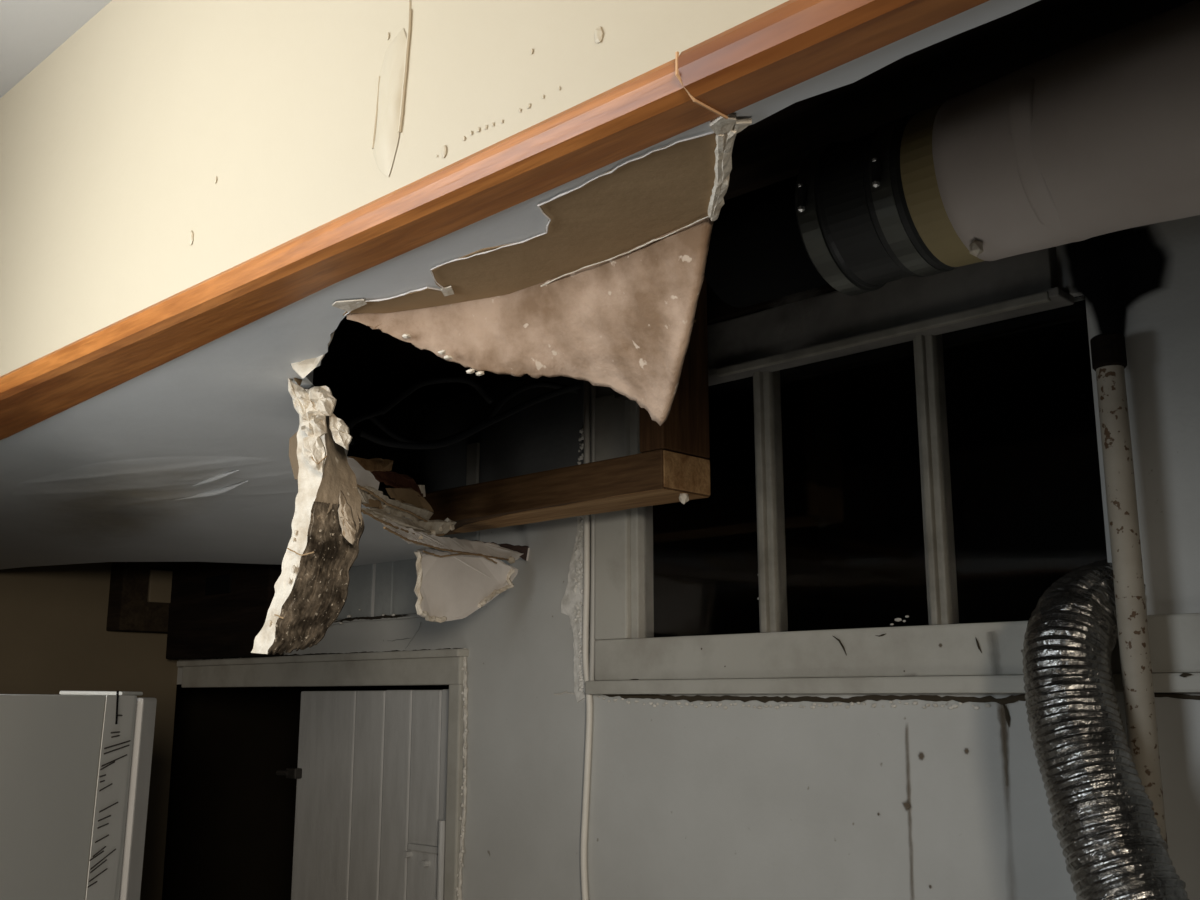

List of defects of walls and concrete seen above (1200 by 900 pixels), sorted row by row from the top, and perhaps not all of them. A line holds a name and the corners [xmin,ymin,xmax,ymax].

peeling [332,114,752,316]
spalling [291,331,335,386]
flaking render [332,609,424,625]